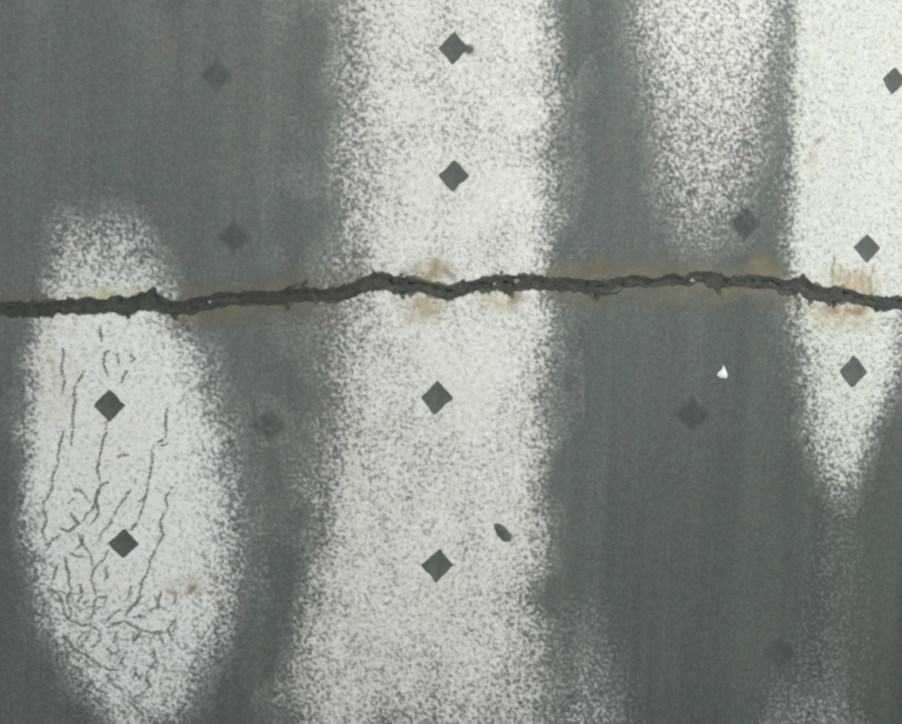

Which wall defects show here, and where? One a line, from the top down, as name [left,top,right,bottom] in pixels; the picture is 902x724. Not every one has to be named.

crack [0,271,902,699]
rust [844,278,872,293]